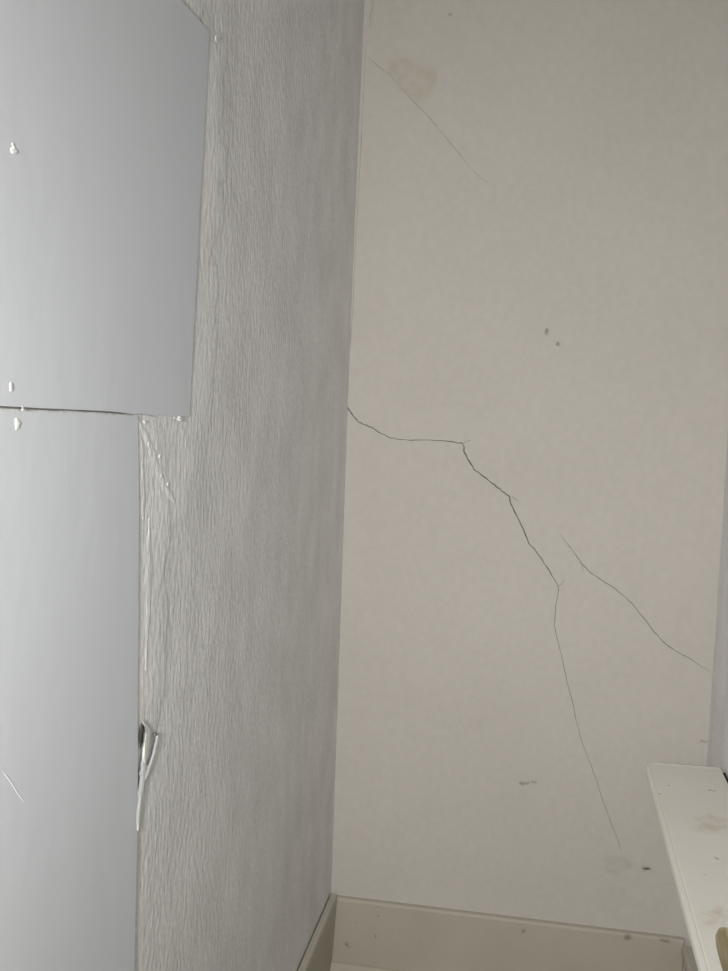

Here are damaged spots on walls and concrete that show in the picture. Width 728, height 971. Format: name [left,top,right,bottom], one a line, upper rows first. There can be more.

crack [348,408,621,849]
crack [562,537,707,670]